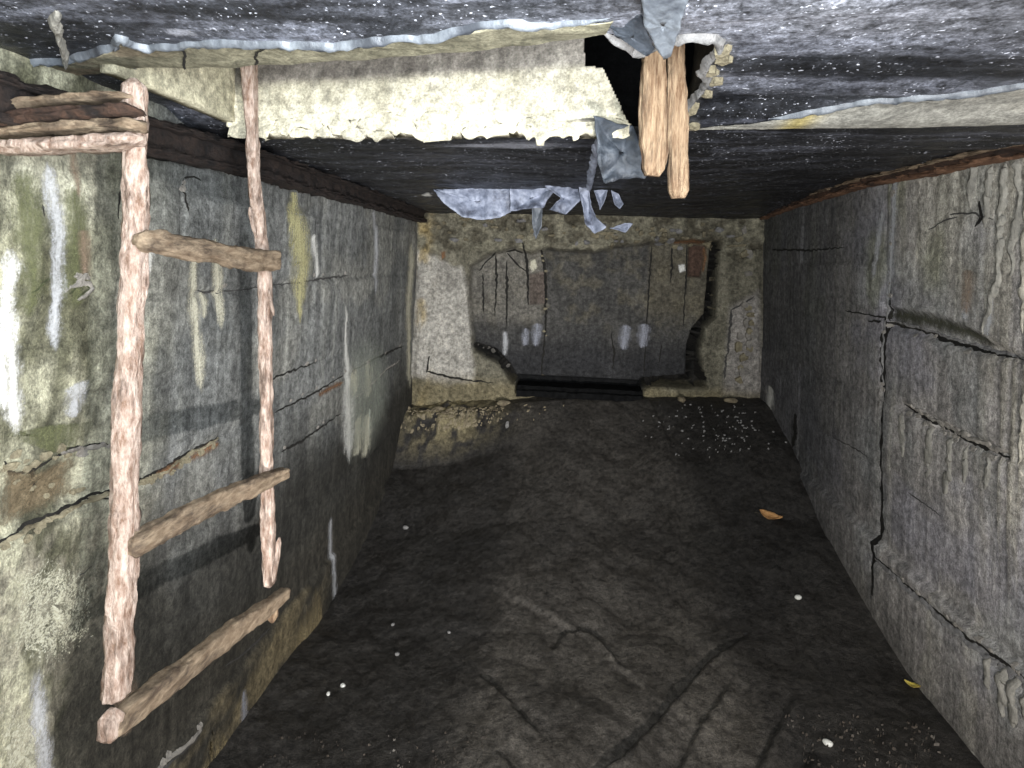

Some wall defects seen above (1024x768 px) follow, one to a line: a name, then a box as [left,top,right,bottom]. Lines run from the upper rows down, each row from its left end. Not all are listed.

peeling [30,18,657,76]
peeling [675,33,1024,131]
water stain [0,165,87,428]
water stain [966,160,1024,337]
crack [0,441,111,550]
crack [138,437,219,486]
crack [791,414,799,448]
crack [834,184,1024,689]